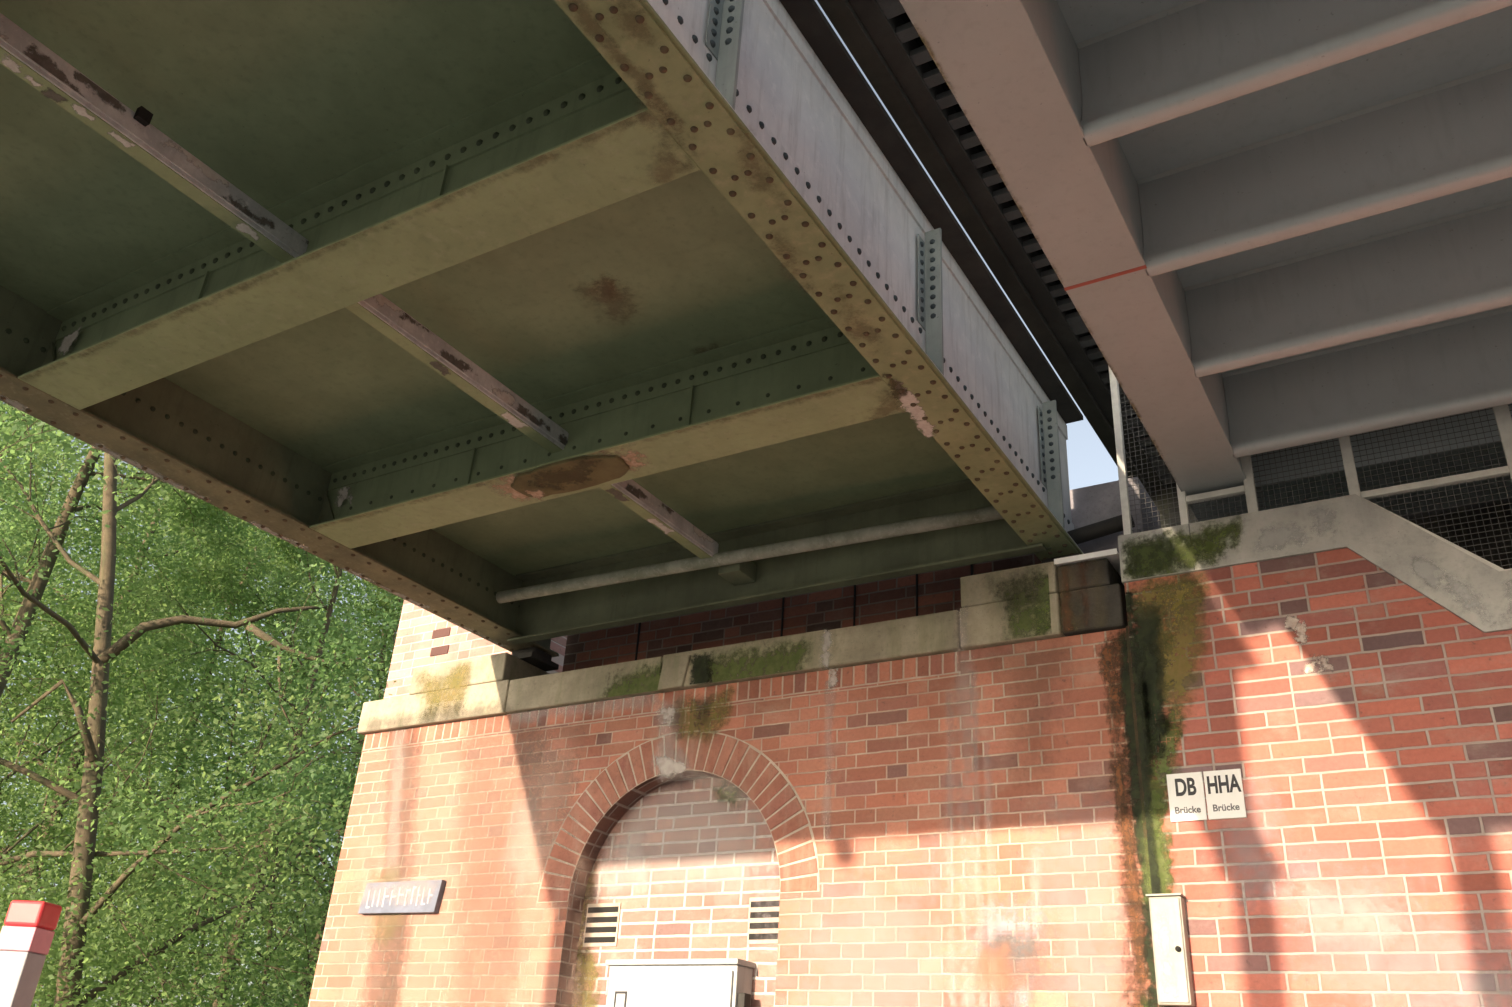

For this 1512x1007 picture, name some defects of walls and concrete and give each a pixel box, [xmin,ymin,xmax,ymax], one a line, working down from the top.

peeling [2,45,126,121]
peeling [429,350,471,376]
peeling [501,404,568,445]
peeling [882,374,936,438]
corrosion [492,449,646,501]
damp [689,654,710,685]